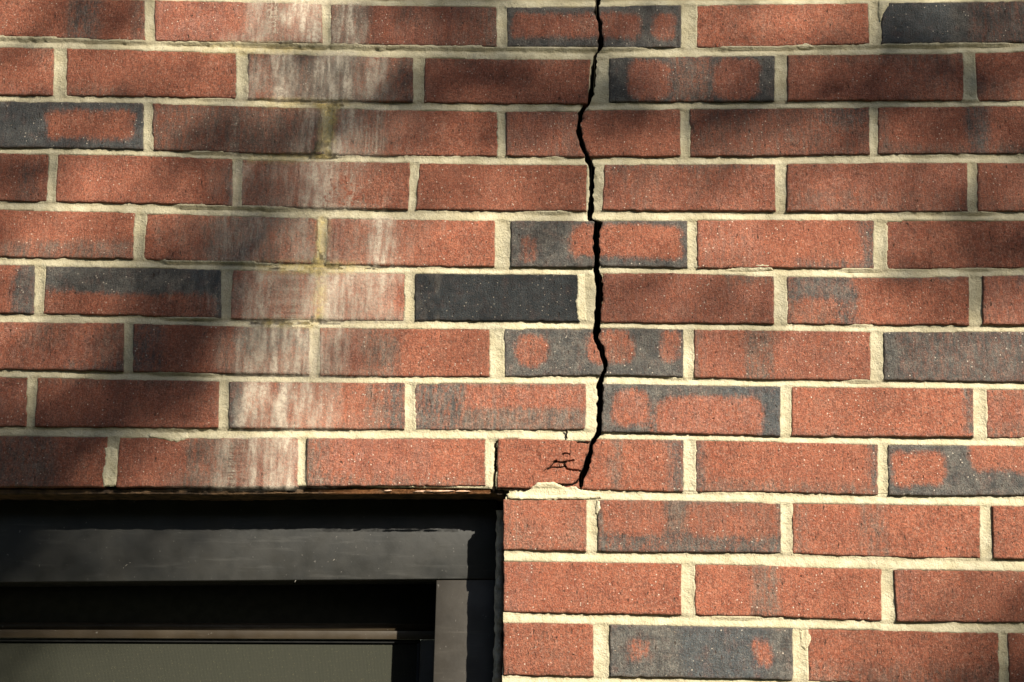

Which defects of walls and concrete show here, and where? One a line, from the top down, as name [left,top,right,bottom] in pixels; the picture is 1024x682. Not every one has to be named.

crack [547,0,608,489]